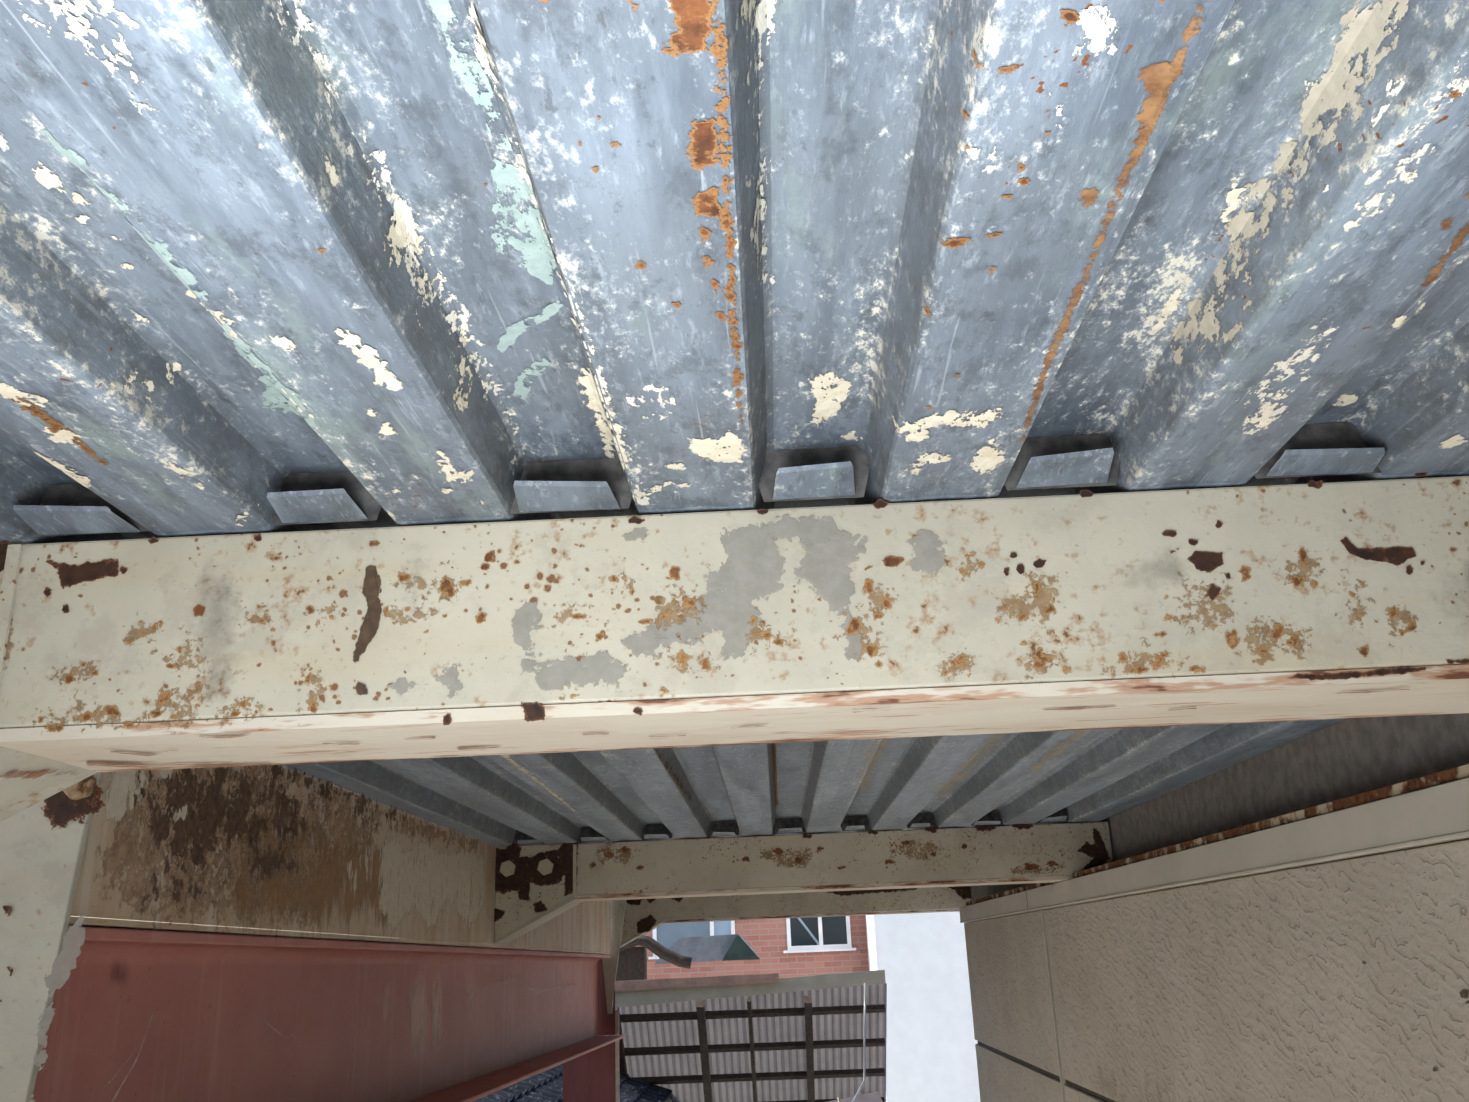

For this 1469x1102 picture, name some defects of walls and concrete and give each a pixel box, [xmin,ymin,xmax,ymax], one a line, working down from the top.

peeling [31,126,317,429]
peeling [322,0,748,506]
rust [661,0,744,425]
rust [1018,6,1202,442]
peeling [1149,0,1409,367]
peeling [808,372,852,426]
peeling [892,408,1007,475]
rust [43,558,127,613]
rust [32,604,263,734]
rust [353,550,496,663]
peeling [510,514,867,691]
rust [1101,530,1426,682]